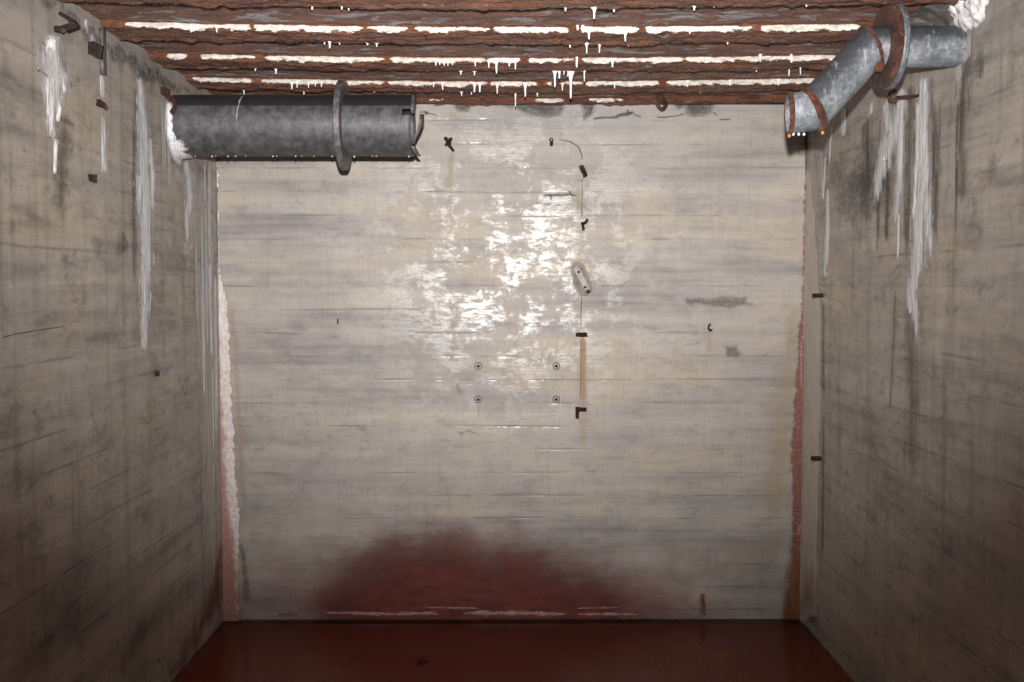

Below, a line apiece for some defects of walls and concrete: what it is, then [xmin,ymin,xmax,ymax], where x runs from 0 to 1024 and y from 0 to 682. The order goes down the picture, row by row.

leakage [37,35,68,174]
leakage [192,77,563,103]
leakage [125,22,861,34]
leakage [201,54,835,65]
leakage [565,78,815,103]
leakage [948,0,989,81]
leakage [860,77,933,341]
leakage [133,77,240,626]
rust [784,185,806,624]
rust [291,537,683,624]